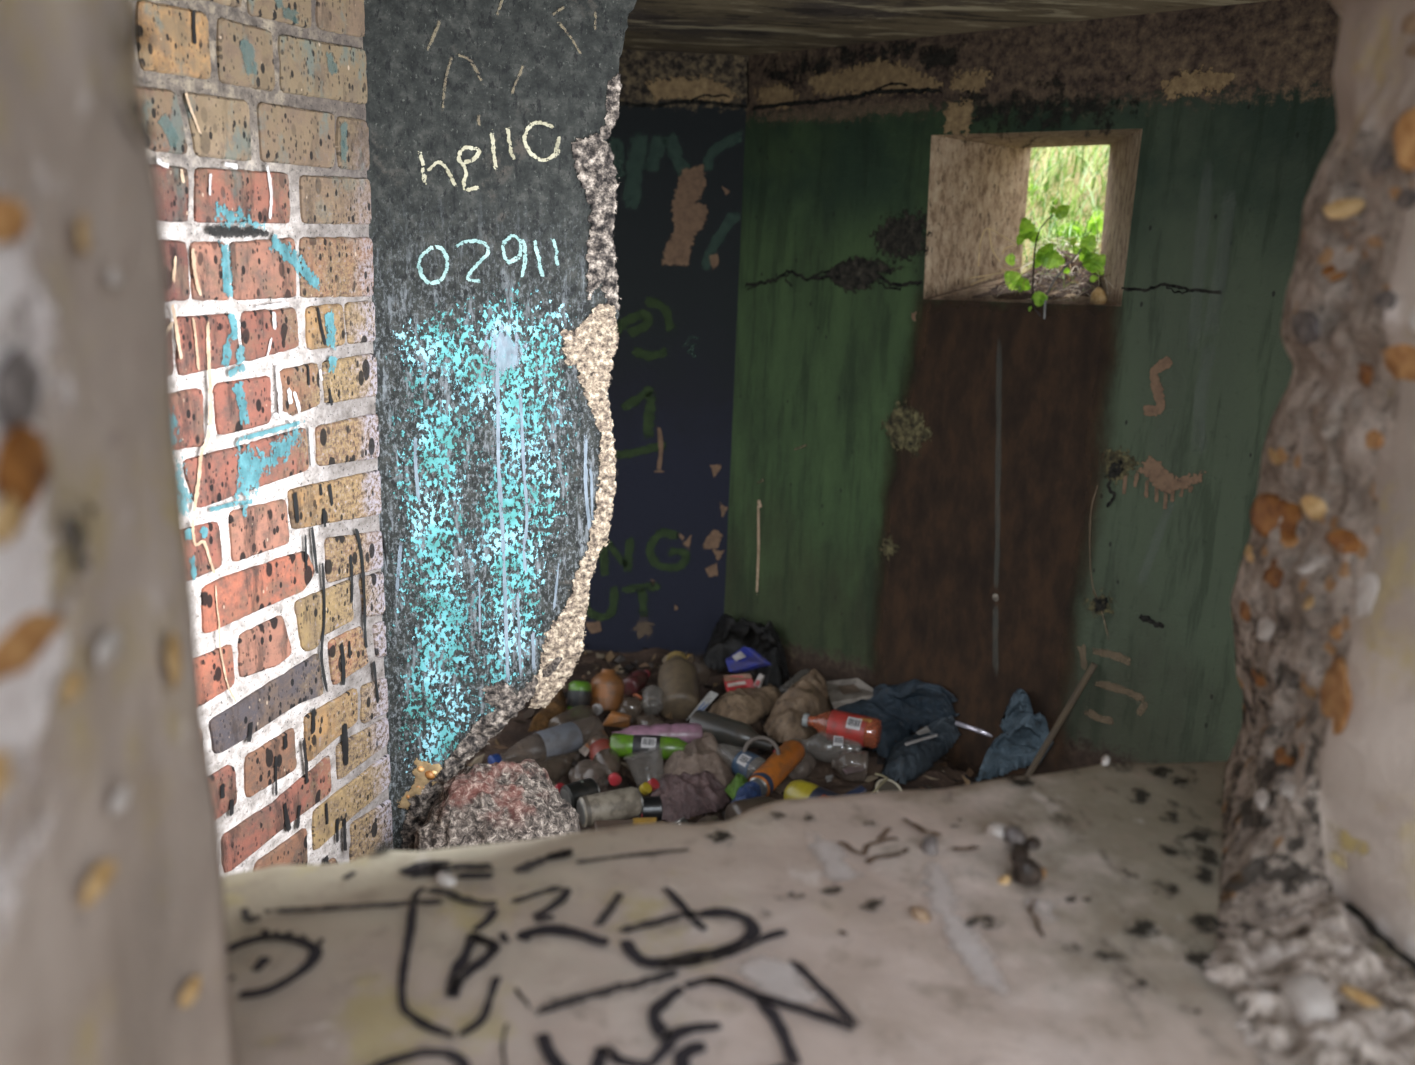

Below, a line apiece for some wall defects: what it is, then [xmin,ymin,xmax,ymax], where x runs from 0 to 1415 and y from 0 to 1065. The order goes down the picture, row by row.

peeling [661,164,730,267]
crack [745,269,923,291]
crack [1121,282,1222,294]
peeling [385,73,622,851]
peeling [679,502,728,577]
crack [1344,903,1415,971]